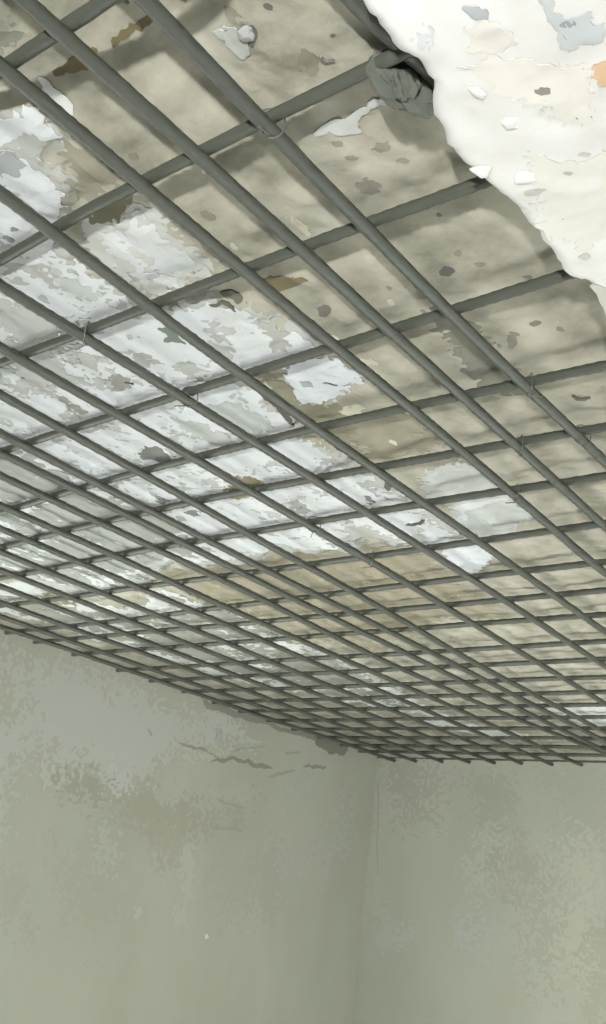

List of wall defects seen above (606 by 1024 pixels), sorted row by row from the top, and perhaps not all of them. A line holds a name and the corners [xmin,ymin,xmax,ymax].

crack [179,742,327,778]
spalling [0,0,606,767]